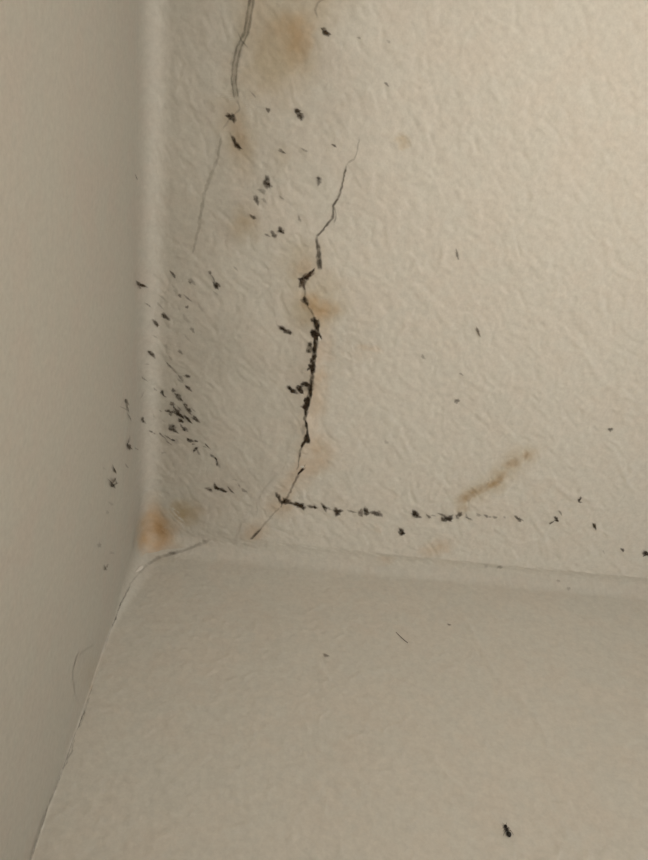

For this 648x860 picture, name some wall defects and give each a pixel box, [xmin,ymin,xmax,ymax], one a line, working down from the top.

water stain [160,387,208,452]
water stain [204,0,385,546]
crack [269,169,346,478]
water stain [441,436,548,522]